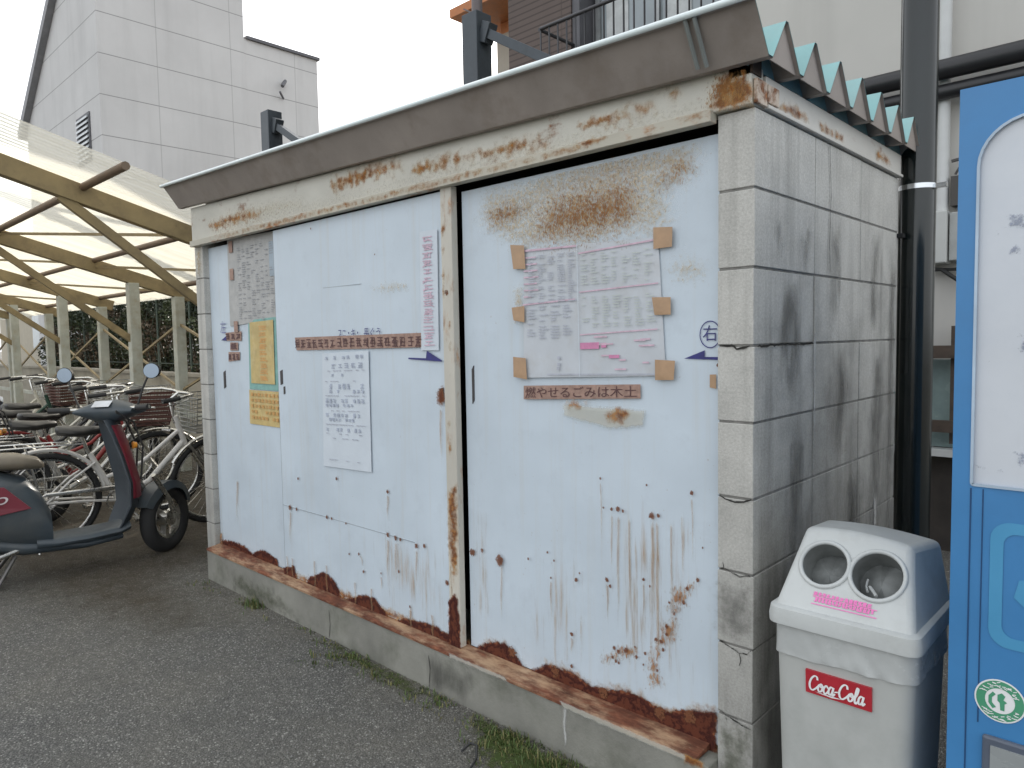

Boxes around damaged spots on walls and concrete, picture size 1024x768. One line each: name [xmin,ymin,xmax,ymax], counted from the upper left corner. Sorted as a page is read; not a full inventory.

corrosion [705,70,752,109]
corrosion [488,147,701,251]
crack [720,342,814,350]
corrosion [220,487,718,752]